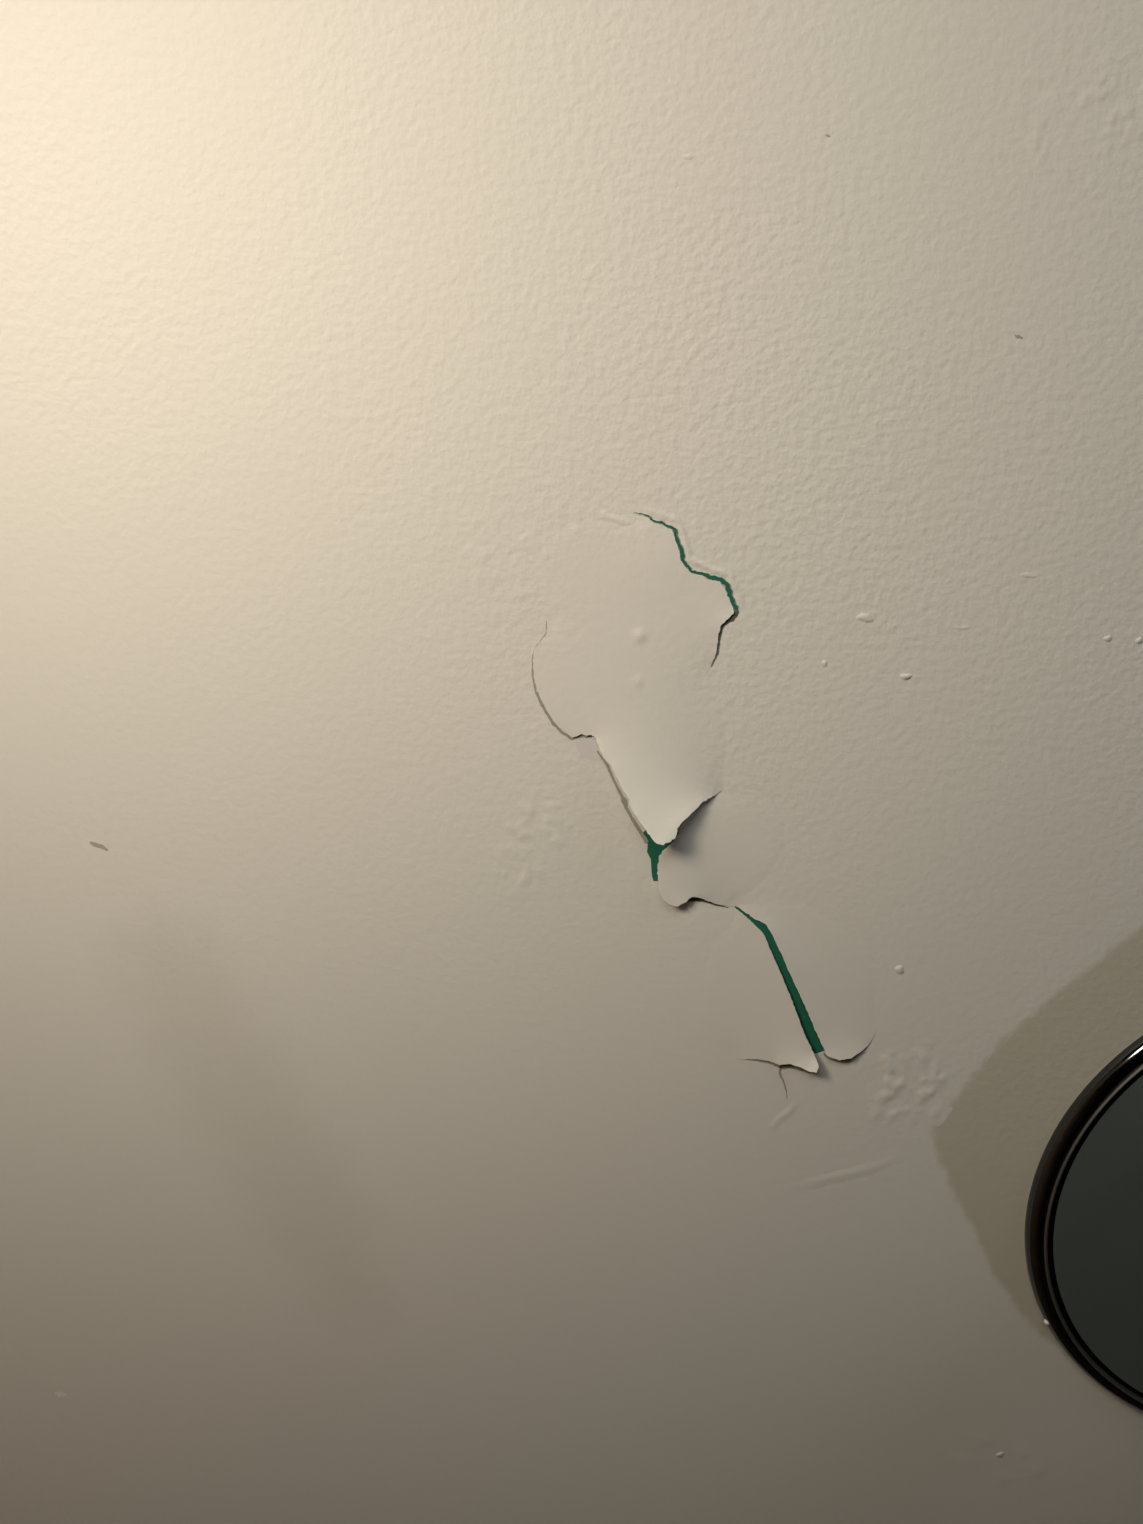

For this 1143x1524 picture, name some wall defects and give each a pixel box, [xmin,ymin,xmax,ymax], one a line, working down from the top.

crack [634,504,747,666]
peeling [532,515,879,1097]
leakage [917,906,1143,1386]